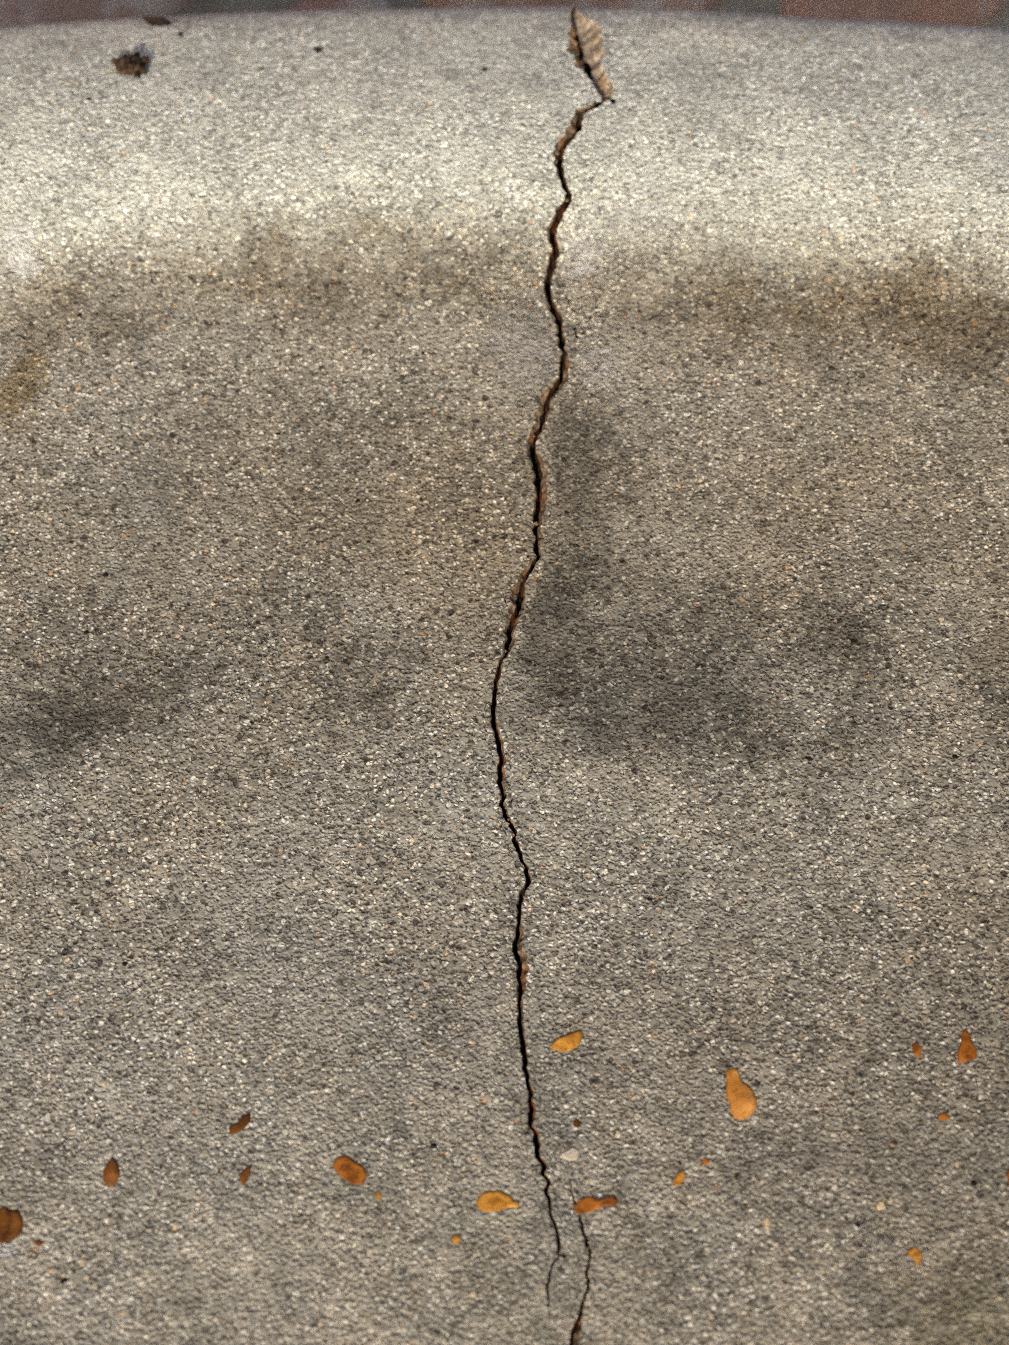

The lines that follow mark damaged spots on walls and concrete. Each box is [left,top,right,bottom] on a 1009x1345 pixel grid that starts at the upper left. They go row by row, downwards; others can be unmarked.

crack [484,94,612,1345]